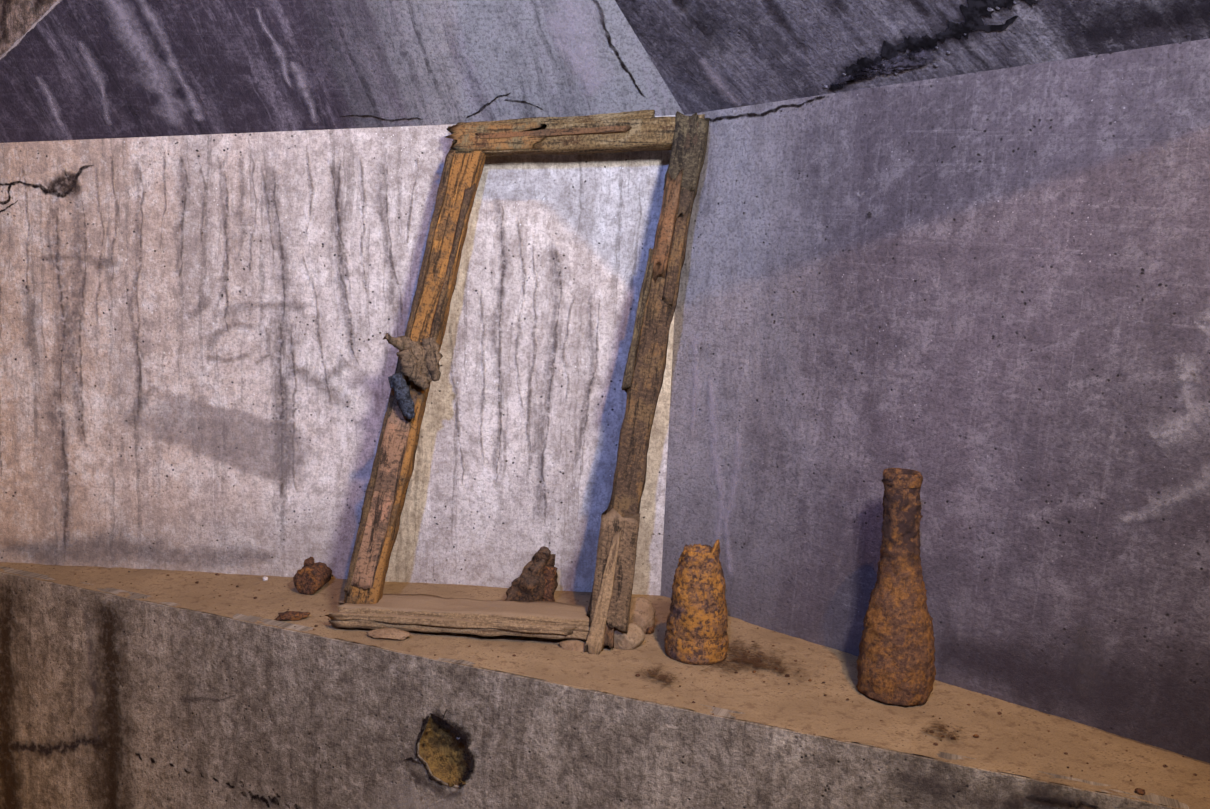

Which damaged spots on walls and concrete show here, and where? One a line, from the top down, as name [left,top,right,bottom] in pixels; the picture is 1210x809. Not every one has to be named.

crack [592,0,645,97]
crack [709,0,1038,122]
crack [340,114,421,122]
crack [467,93,543,118]
crack [0,165,93,212]
water stain [0,589,20,809]
water stain [98,610,129,809]
crack [0,736,301,809]
spalling [404,709,475,796]